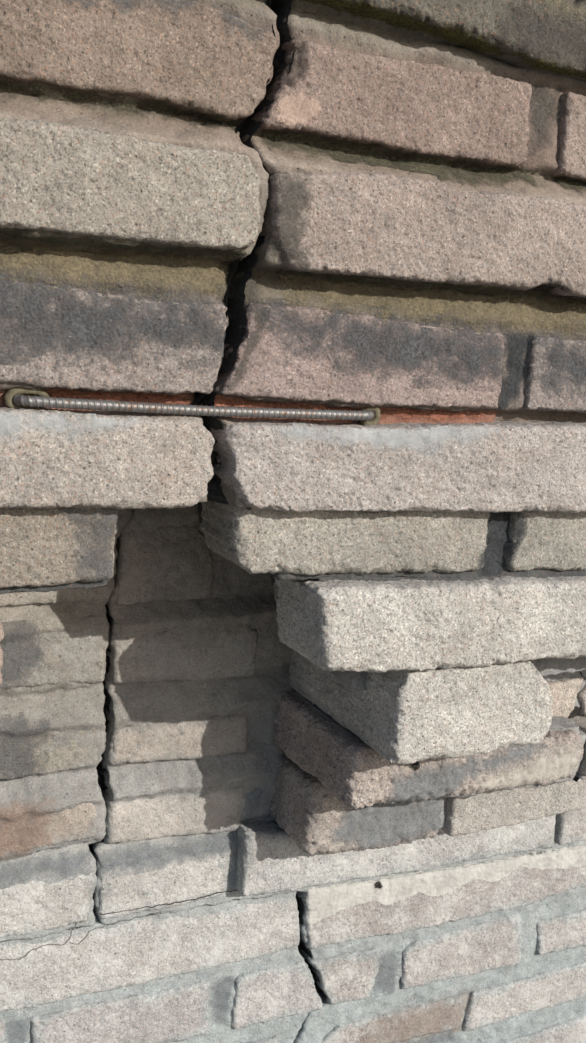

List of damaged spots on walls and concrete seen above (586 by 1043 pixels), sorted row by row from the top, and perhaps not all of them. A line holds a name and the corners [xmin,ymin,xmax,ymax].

crack [236,0,296,147]
rust [46,390,192,405]
crack [193,236,265,511]
rust [214,398,361,419]
rust [380,408,483,421]
crack [96,605,111,790]
crack [0,890,238,960]
crack [296,893,326,1003]